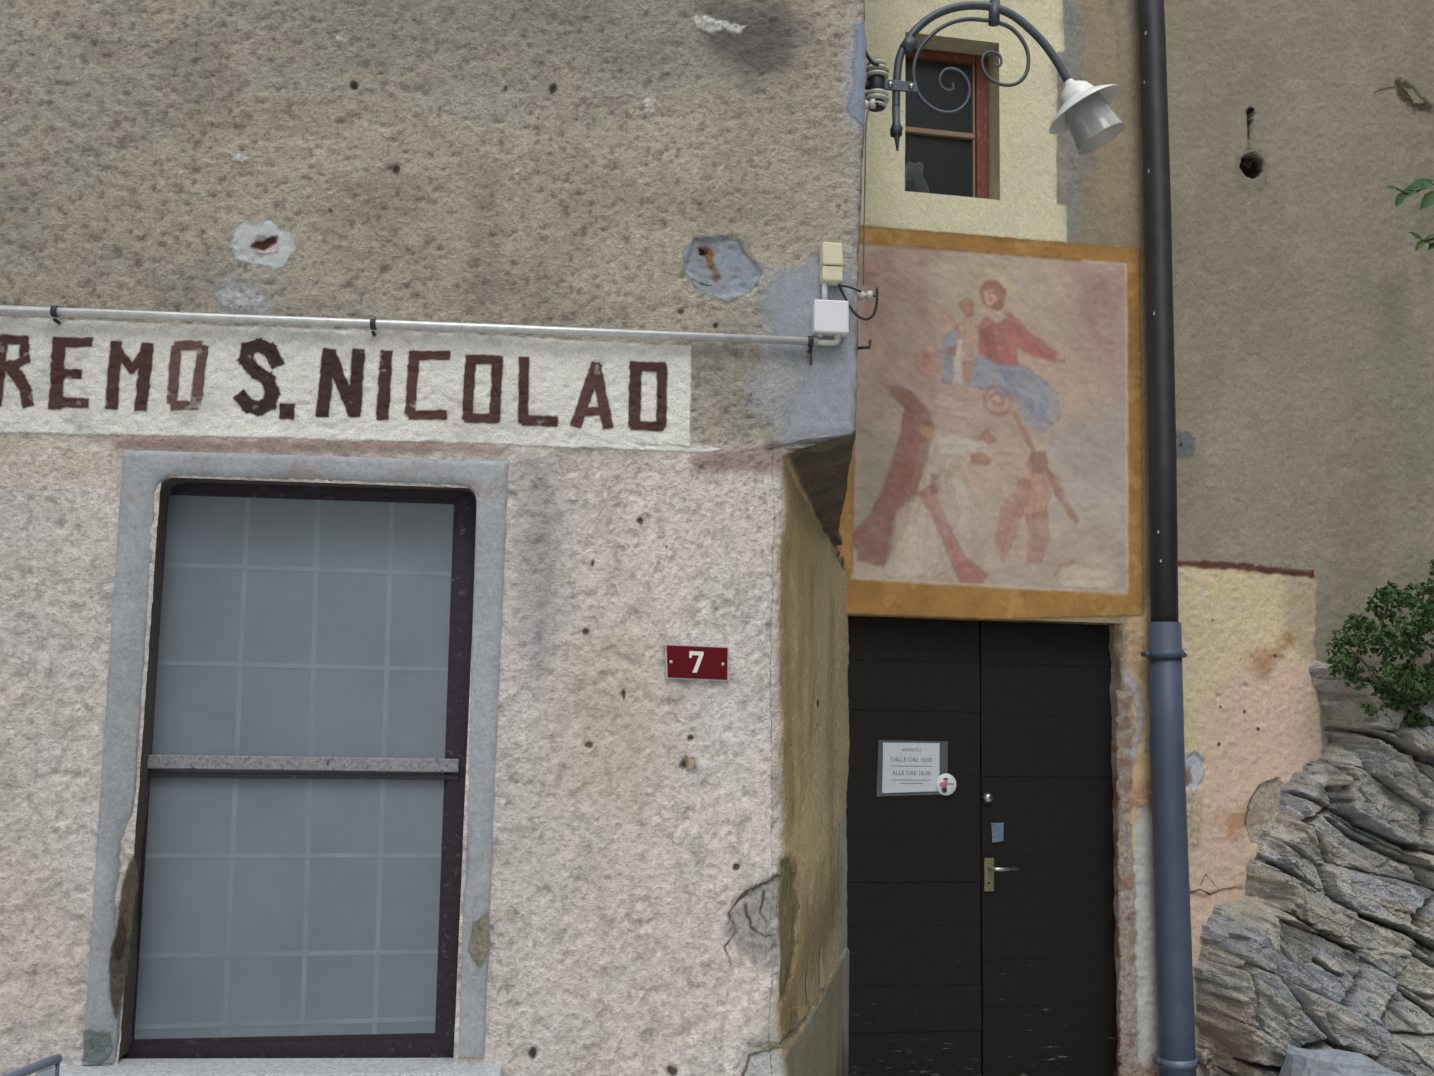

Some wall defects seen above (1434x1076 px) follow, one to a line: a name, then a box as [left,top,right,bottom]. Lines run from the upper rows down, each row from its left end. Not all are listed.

peeling [229,220,297,270]
spalling [682,234,764,302]
peeling [1185,749,1204,850]
spalling [82,857,138,1062]
spalling [468,914,491,967]
peeling [730,862,795,985]
flaking render [1116,672,1152,1076]